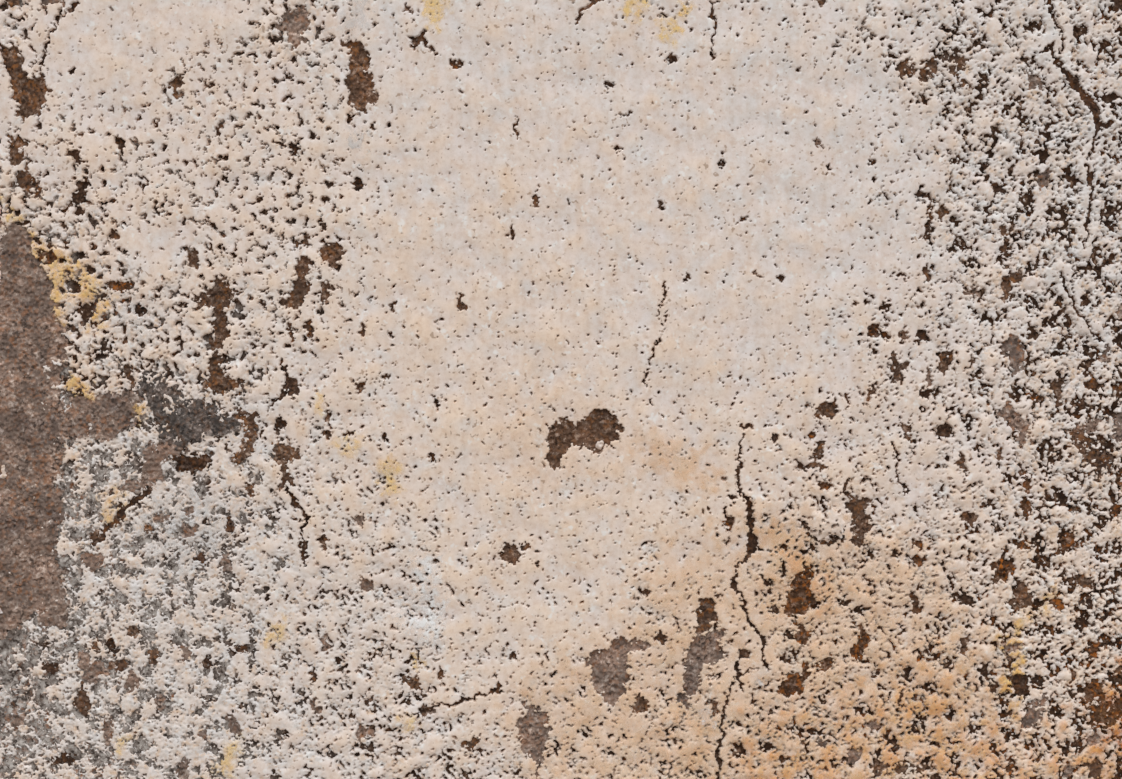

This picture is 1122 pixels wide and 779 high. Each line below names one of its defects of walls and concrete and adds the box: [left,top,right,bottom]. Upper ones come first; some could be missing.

spalling [275,5,311,51]
crack [575,0,604,25]
spalling [168,71,187,101]
crack [1039,0,1114,249]
crack [1059,272,1106,345]
spalling [0,217,301,641]
spalling [545,409,624,471]
crack [715,433,787,779]
spalling [73,625,141,717]
spalling [585,630,668,714]
spalling [676,591,751,716]
spalling [515,700,553,779]